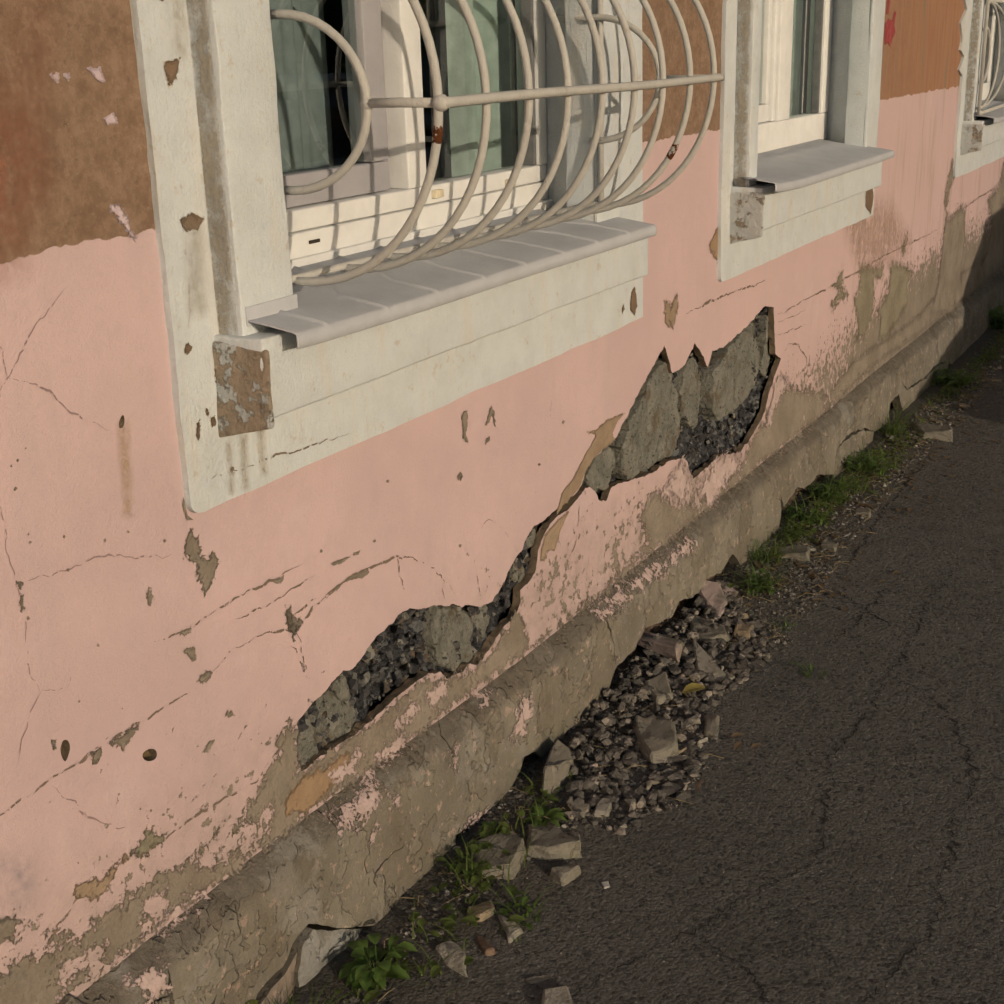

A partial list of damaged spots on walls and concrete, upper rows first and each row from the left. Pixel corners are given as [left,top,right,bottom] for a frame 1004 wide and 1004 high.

peeling [180,212,205,232]
crack [687,280,765,314]
crack [0,292,106,430]
peeling [196,407,216,442]
crack [213,434,347,478]
peeling [485,406,496,445]
peeling [541,159,1004,640]
peeling [183,497,222,596]
crack [154,555,447,679]
crack [0,692,190,829]
crack [143,748,281,854]
peeling [0,527,552,1004]